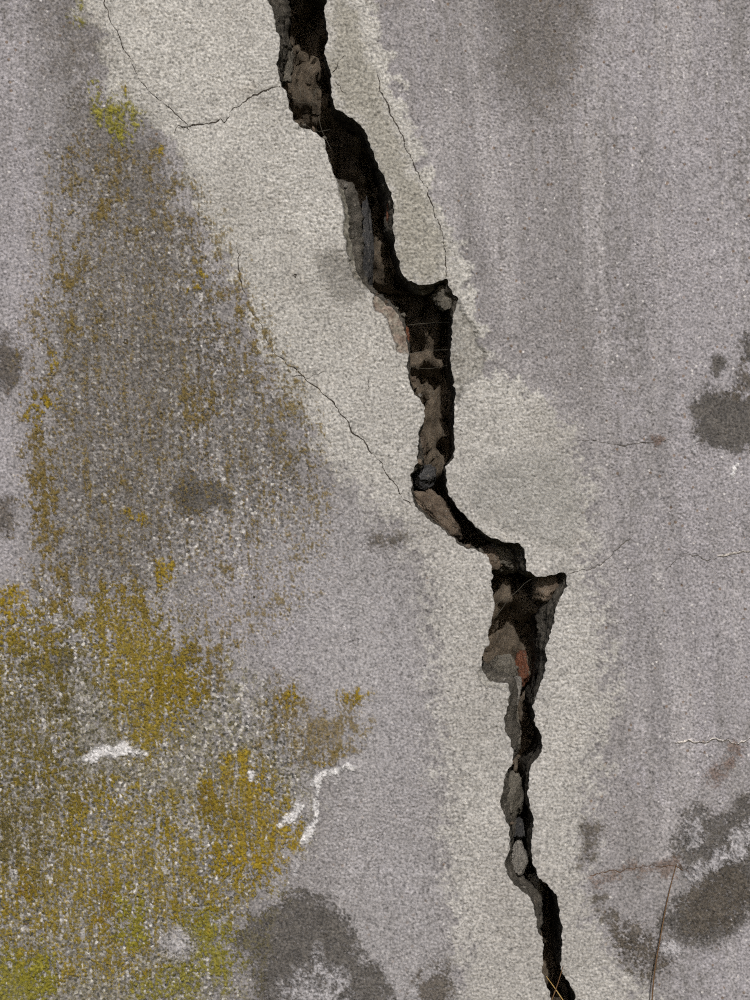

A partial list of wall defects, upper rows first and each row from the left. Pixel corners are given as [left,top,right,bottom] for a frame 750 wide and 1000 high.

damp [0,331,24,400]
damp [688,331,750,478]
damp [0,496,19,539]
damp [170,470,233,516]
crack [103,0,631,1000]
damp [30,648,82,674]
damp [82,741,148,764]
damp [577,823,603,868]
damp [227,763,396,1000]
damp [592,793,750,983]
damp [157,925,194,963]
damp [407,961,456,1000]